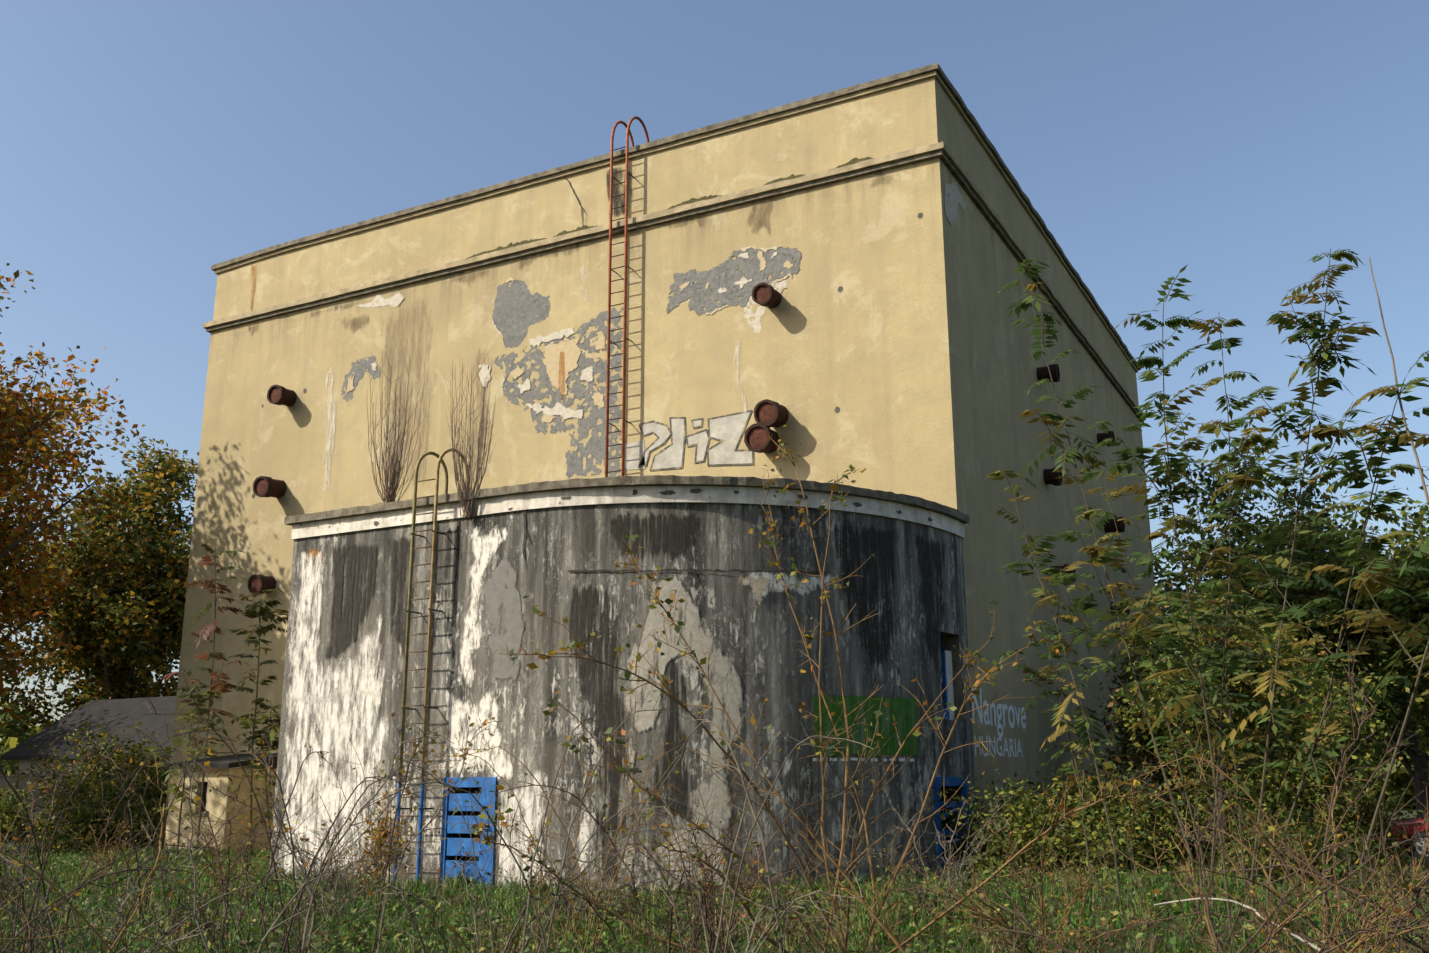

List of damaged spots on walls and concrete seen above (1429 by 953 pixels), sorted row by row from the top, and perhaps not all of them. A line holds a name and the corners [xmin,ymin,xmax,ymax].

flaking render [667,245,801,333]
flaking render [341,356,381,402]
flaking render [478,278,624,479]
damp [325,536,415,659]
damp [444,526,462,637]
damp [610,512,700,562]
damp [835,523,899,665]
damp [916,535,946,680]
damp [569,584,628,882]
damp [655,660,687,819]